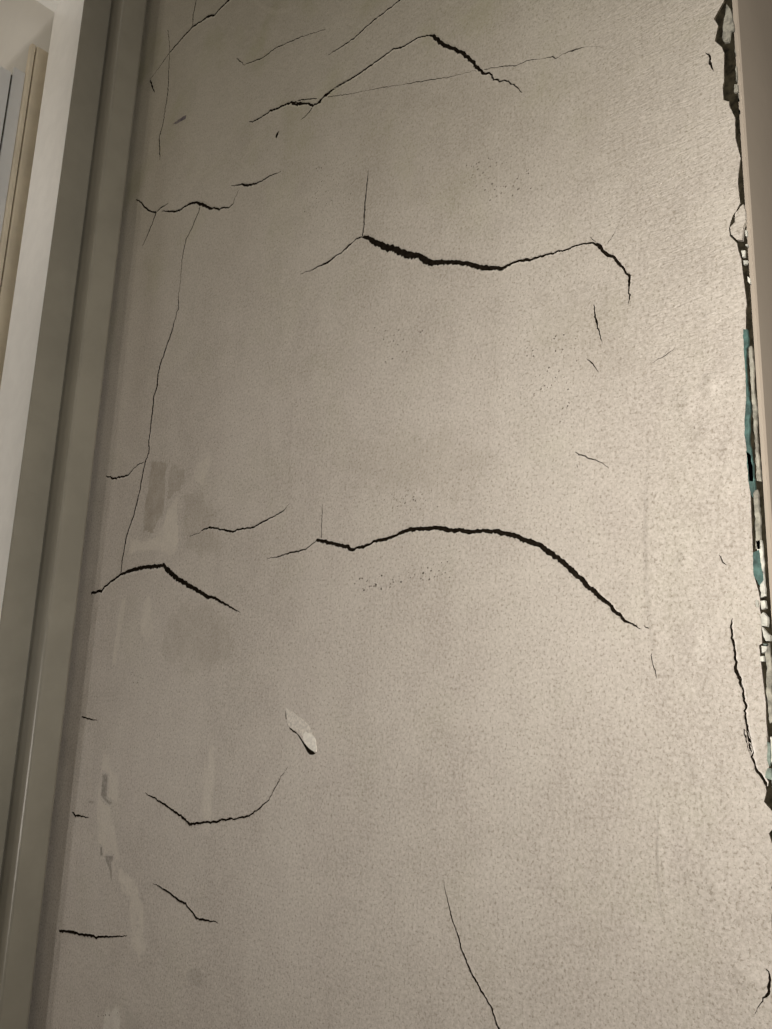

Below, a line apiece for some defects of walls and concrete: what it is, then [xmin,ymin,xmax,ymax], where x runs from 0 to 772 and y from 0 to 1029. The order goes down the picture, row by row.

crack [249,32,594,123]
crack [301,176,632,305]
crack [91,171,289,613]
crack [586,305,602,373]
flaking render [715,0,772,809]
crack [267,504,657,678]
flaking render [285,708,317,755]
crack [729,618,768,787]
crack [145,767,288,828]
crack [59,928,127,941]
crack [153,883,218,924]
crack [443,880,501,1029]